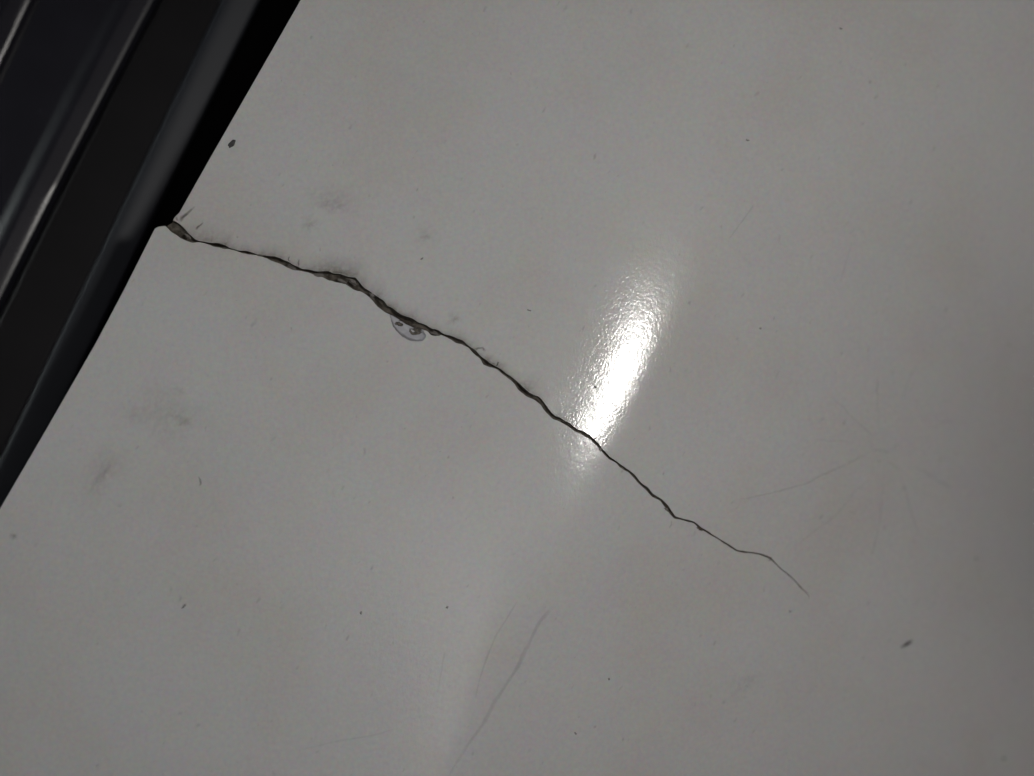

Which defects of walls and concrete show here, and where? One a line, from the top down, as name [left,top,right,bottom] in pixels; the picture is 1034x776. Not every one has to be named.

crack [166,213,809,596]